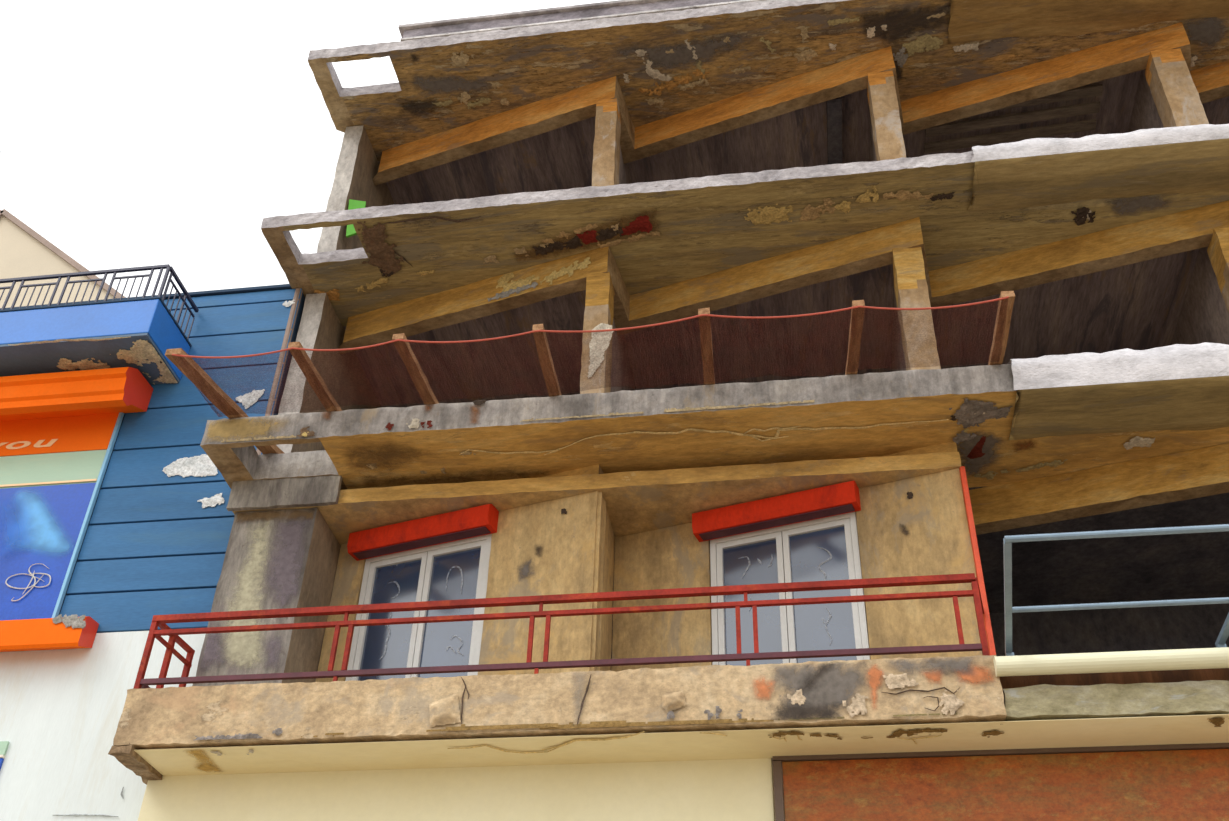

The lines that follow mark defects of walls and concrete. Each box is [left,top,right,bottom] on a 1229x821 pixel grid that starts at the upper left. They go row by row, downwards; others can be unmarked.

water stain [1185,17,1228,46]
water stain [618,35,741,81]
water stain [400,55,491,114]
spalling [355,221,404,292]
flaking render [483,211,660,301]
peeling [8,336,178,385]
crack [459,419,949,455]
peeling [162,454,218,477]
peeling [197,493,225,508]
water stain [891,658,971,673]
crack [447,673,644,754]
water stain [426,663,863,732]